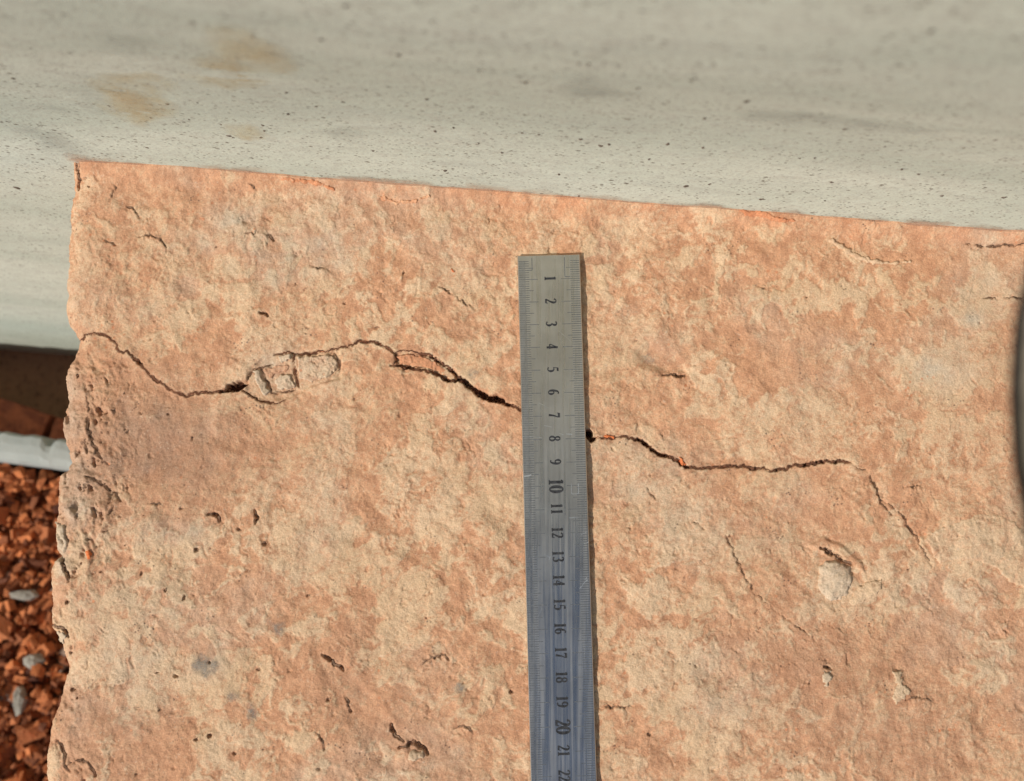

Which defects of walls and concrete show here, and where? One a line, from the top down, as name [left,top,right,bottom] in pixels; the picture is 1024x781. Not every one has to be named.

crack [81,332,521,411]
crack [84,397,120,512]
crack [585,431,930,561]
spalling [818,558,882,605]